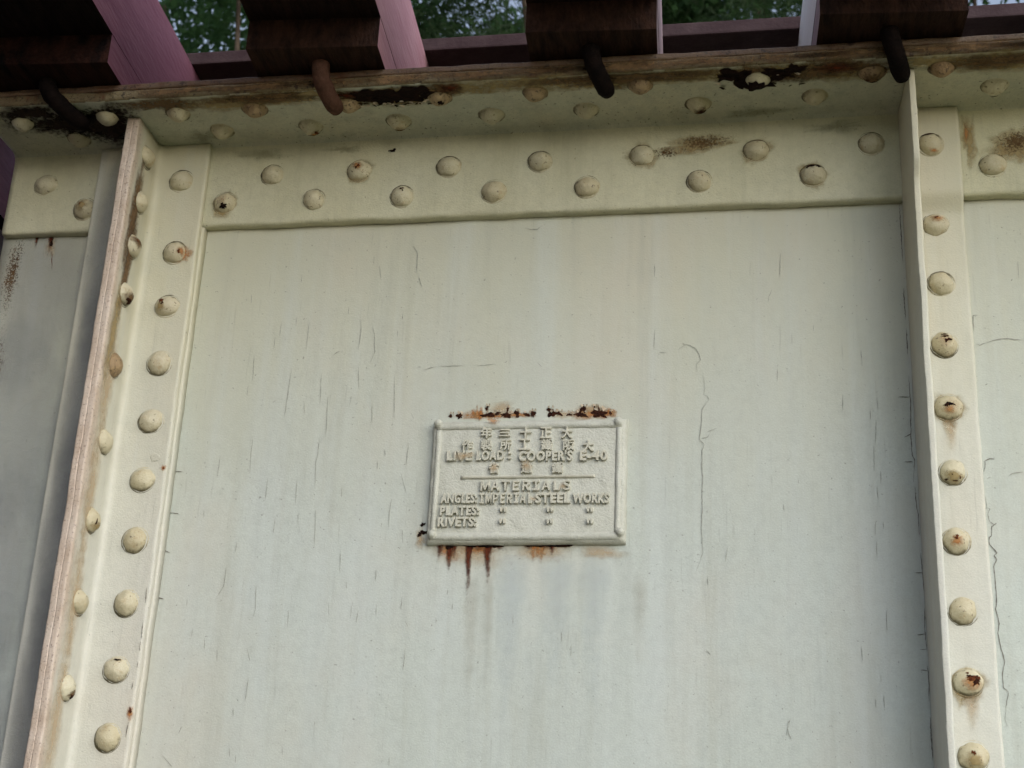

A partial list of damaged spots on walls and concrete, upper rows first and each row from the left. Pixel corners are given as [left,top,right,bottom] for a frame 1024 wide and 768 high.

rust [646,135,731,166]
rust [994,131,1024,160]
rust [465,408,525,423]
rust [934,402,961,434]
crack [654,330,727,583]
rust [438,545,504,583]
crack [986,504,1009,724]
rust [956,672,983,705]